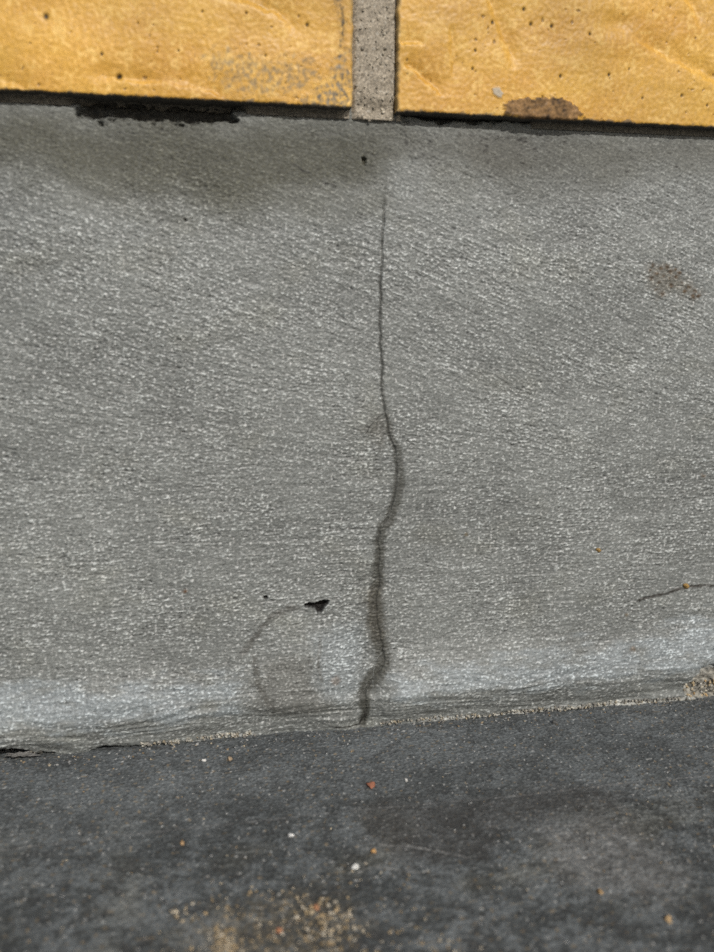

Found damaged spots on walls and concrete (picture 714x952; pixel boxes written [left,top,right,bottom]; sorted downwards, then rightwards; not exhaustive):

spalling [398,92,588,164]
crack [328,198,398,729]